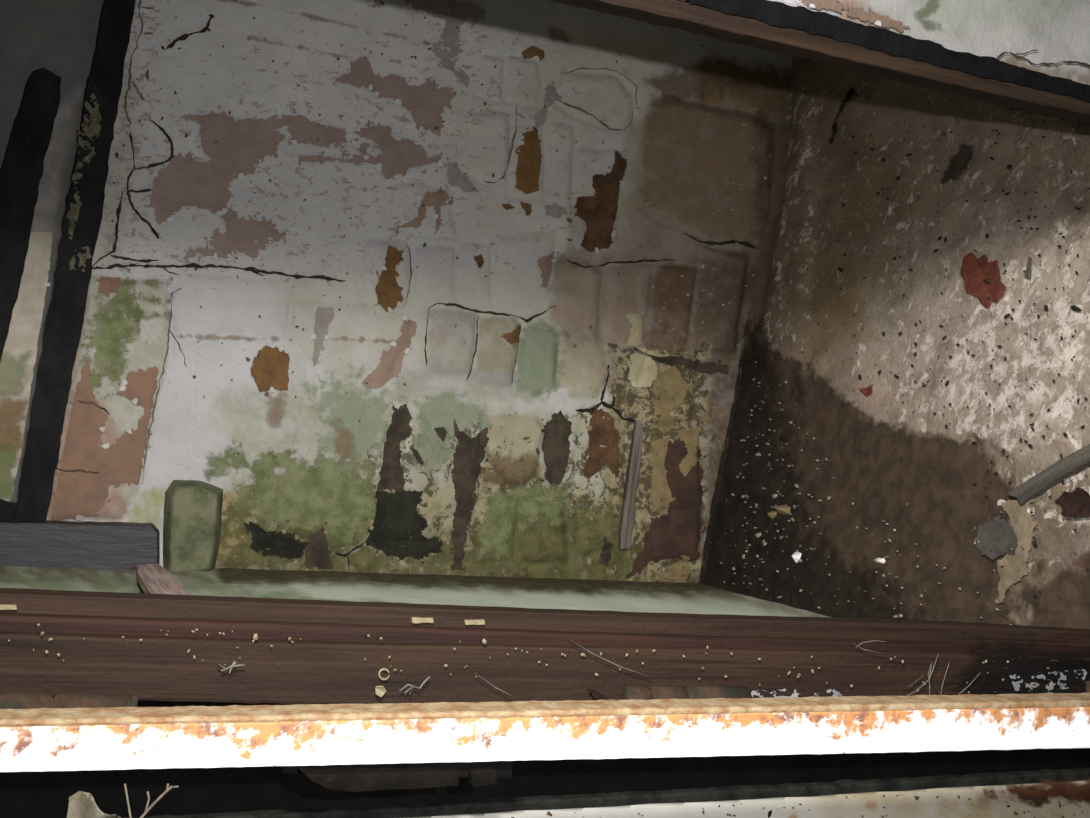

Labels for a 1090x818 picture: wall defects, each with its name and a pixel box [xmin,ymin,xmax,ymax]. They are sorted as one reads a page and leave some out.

crack [92,0,346,484]
spalling [251,345,294,397]
peeling [149,0,489,389]
crack [405,243,551,381]
spalling [545,150,627,253]
crack [566,259,678,268]
crack [684,233,759,249]
peeling [358,404,491,571]
peeling [536,410,572,485]
damp [218,321,1090,638]
peeling [626,437,707,578]
damp [954,640,1090,695]